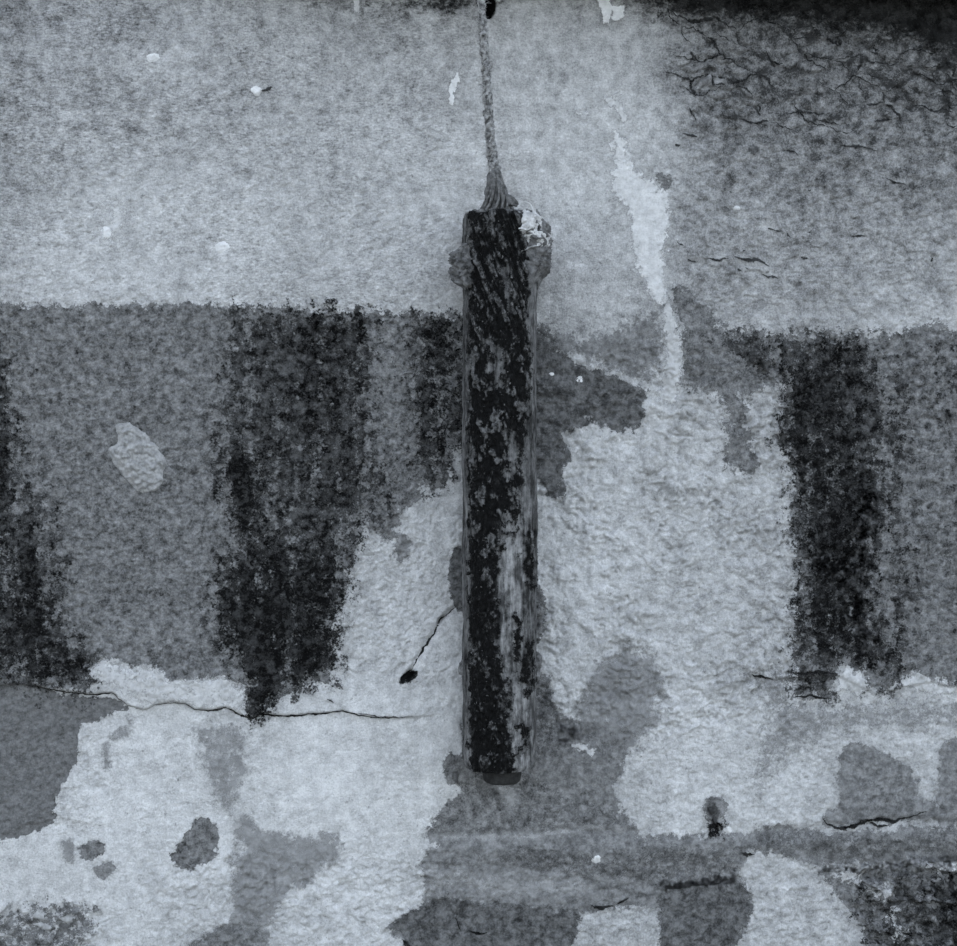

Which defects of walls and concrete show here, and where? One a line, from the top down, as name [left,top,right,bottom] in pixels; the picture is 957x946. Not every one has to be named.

crack [665,10,957,155]
crack [677,241,778,279]
leakage [0,298,463,726]
leakage [386,93,957,946]
crack [399,608,454,684]
crack [39,686,403,719]
leakage [199,721,246,806]
crack [823,811,926,831]